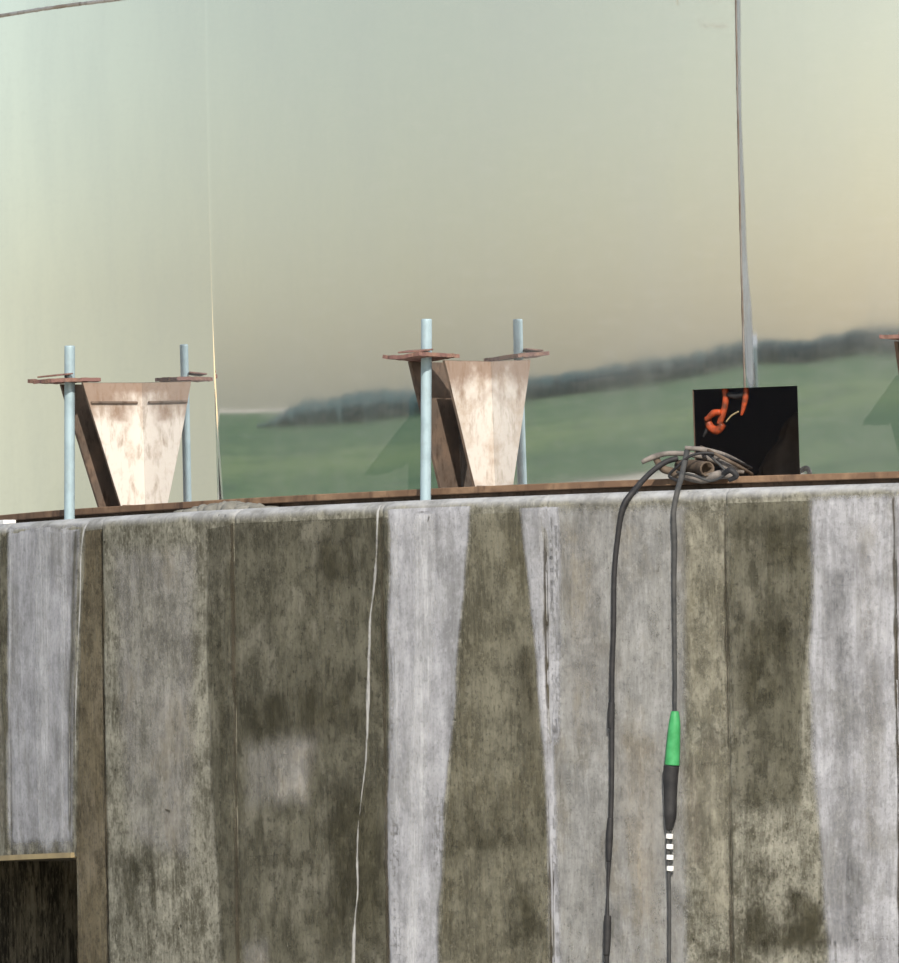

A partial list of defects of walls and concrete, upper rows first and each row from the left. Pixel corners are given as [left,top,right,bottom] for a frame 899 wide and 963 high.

damp [0,523,108,963]
damp [120,553,190,853]
damp [208,496,899,963]